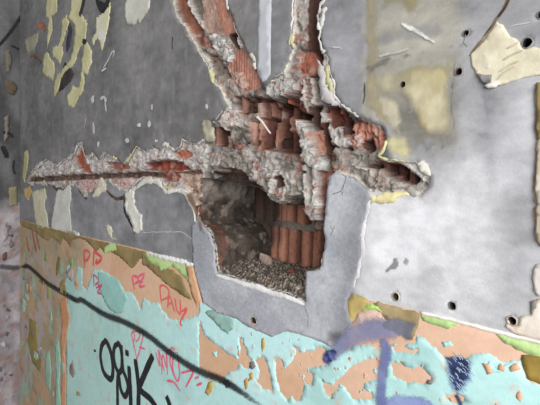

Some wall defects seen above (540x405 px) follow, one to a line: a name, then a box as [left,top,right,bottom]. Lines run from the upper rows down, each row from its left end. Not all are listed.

spalling [25,0,431,306]
damp [387,136,408,156]
damp [367,59,451,132]
peeling [470,22,540,245]
peeling [19,185,540,405]